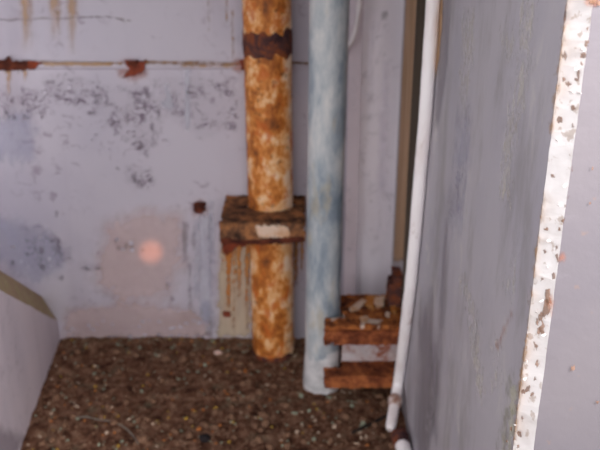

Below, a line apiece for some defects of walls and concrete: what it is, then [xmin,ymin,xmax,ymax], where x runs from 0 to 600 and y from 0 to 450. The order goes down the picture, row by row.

corrosion [218,237,304,337]